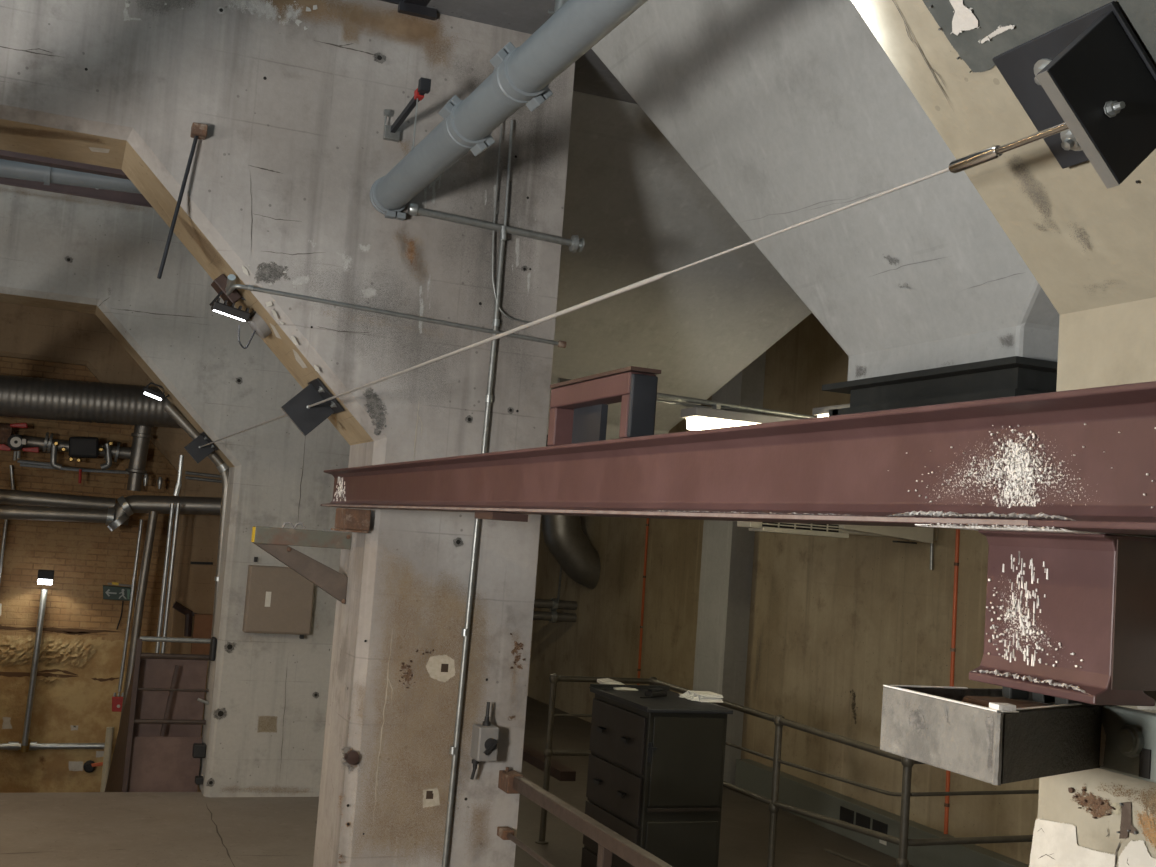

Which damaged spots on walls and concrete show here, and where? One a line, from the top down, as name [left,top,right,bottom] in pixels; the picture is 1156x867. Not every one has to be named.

peeling [922,0,1156,73]
corrosion [508,630,526,720]